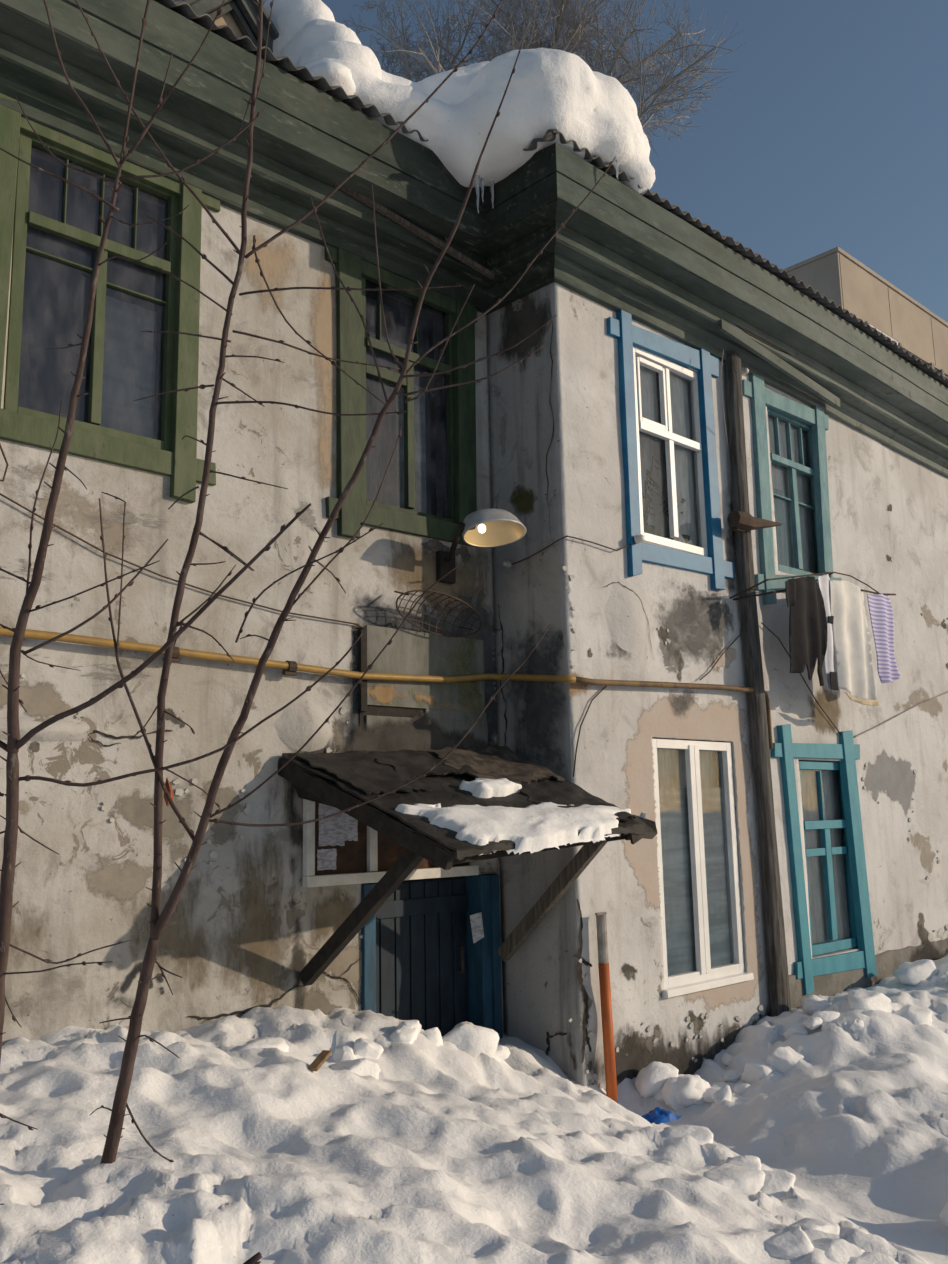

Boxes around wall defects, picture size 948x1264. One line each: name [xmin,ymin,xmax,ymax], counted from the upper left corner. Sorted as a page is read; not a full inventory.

water stain [500,294,549,364]
spalling [0,673,85,721]
water stain [513,633,565,768]
peeling [659,638,683,672]
spalling [87,774,253,904]
water stain [134,902,209,987]
water stain [224,780,354,1009]
peeling [622,695,763,1011]
spalling [862,750,940,880]
water stain [568,1005,770,1084]